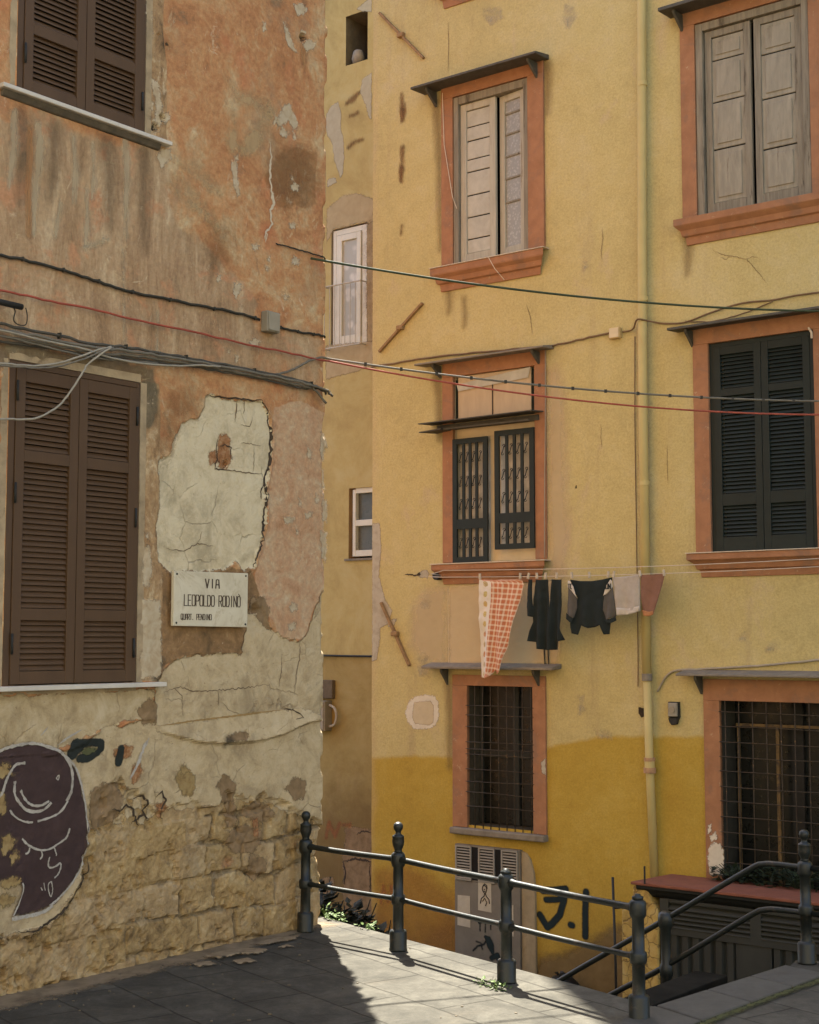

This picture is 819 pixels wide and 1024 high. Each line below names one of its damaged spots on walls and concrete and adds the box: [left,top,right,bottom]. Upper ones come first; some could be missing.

peeling [357,0,372,12]
peeling [274,103,298,140]
peeling [326,102,344,187]
crack [264,143,275,242]
crack [207,394,273,567]
flaking render [0,394,372,996]
peeling [707,824,724,875]